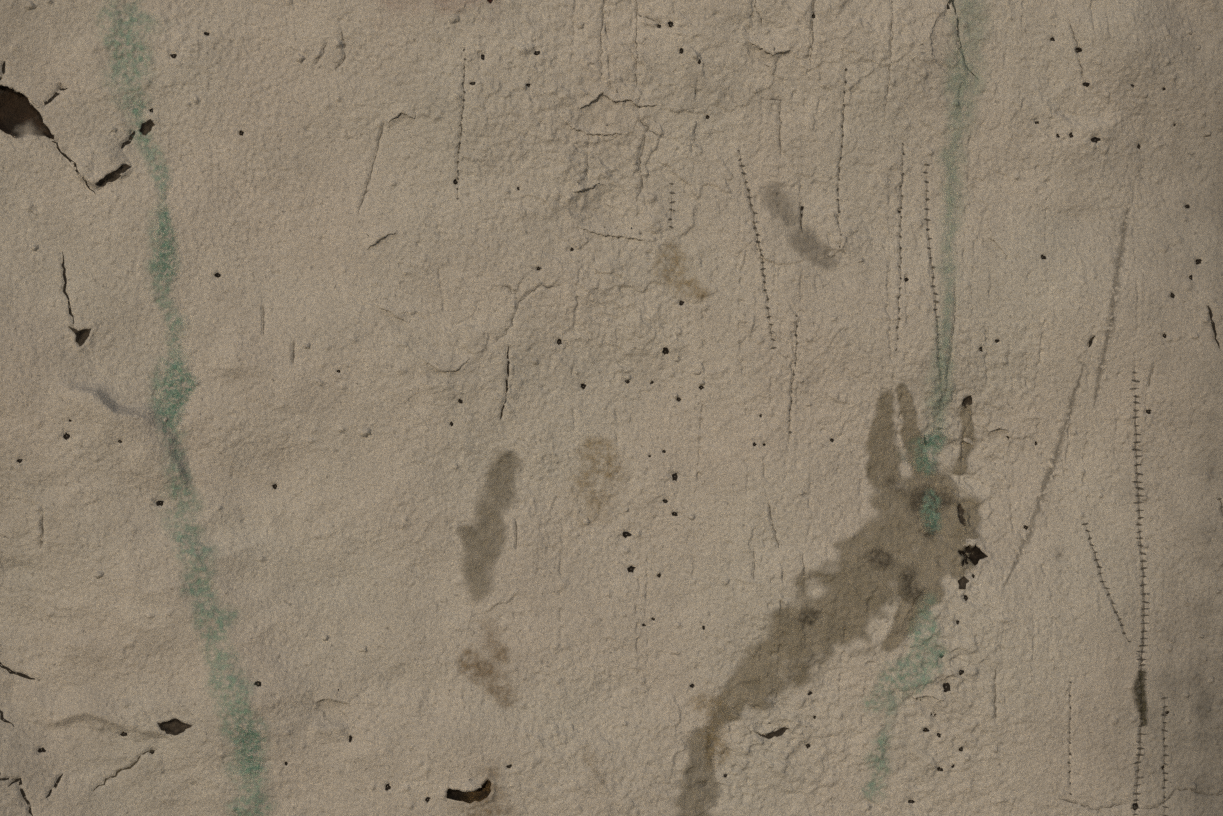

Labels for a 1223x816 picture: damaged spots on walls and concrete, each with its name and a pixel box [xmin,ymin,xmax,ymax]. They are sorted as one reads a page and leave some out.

spalling [0,75,55,141]
spalling [96,164,131,187]
spalling [68,326,91,347]
water stain [460,453,516,596]
spalling [958,504,988,589]
water stain [678,385,979,816]
spalling [158,718,192,735]
spalling [447,777,491,804]